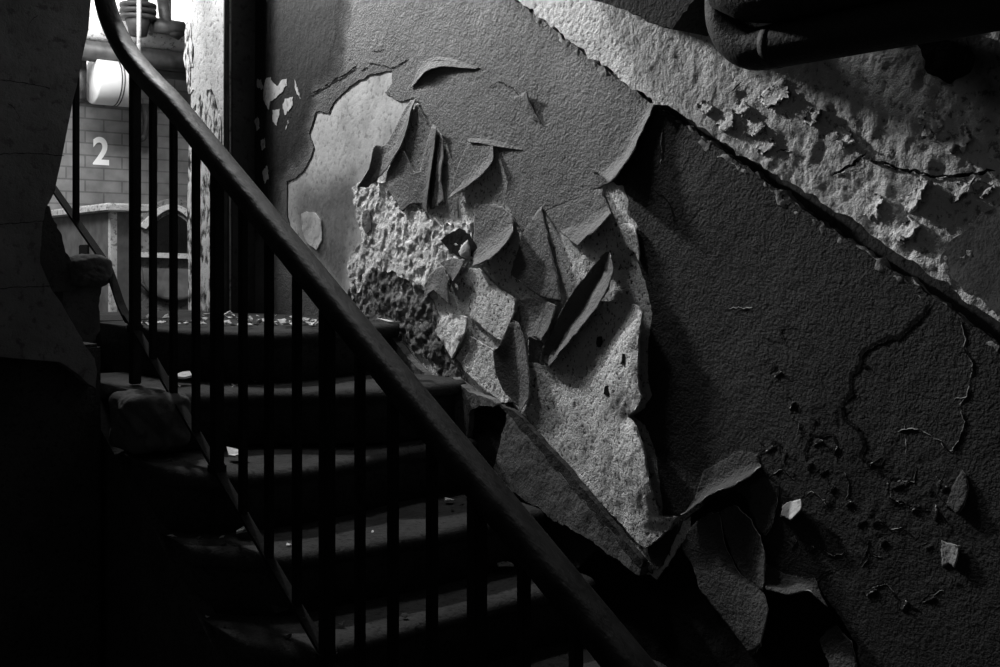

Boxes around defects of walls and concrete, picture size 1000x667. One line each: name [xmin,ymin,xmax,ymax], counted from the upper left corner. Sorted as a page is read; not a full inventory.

spalling [517,3,625,86]
peeling [257,77,301,129]
spalling [287,57,996,656]
crack [758,301,974,613]
peeling [820,625,857,667]